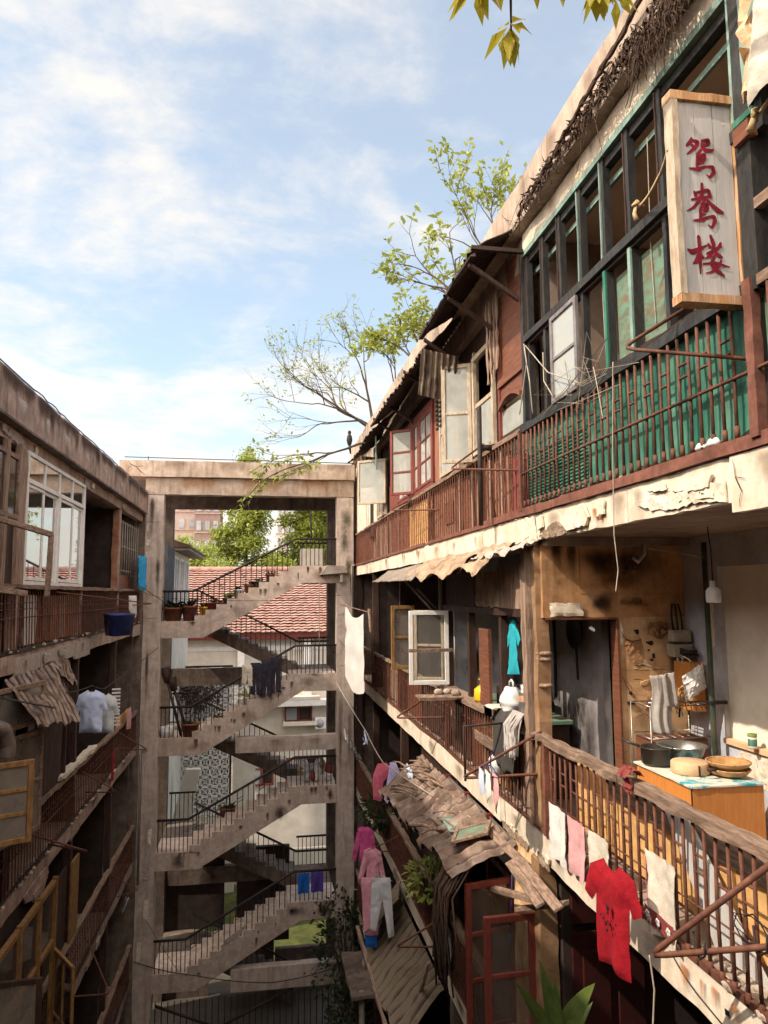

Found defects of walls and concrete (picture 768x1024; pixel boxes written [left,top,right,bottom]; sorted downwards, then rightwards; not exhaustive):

spalling [637,475,728,511]
leakage [594,596,609,610]
peeling [619,621,668,668]